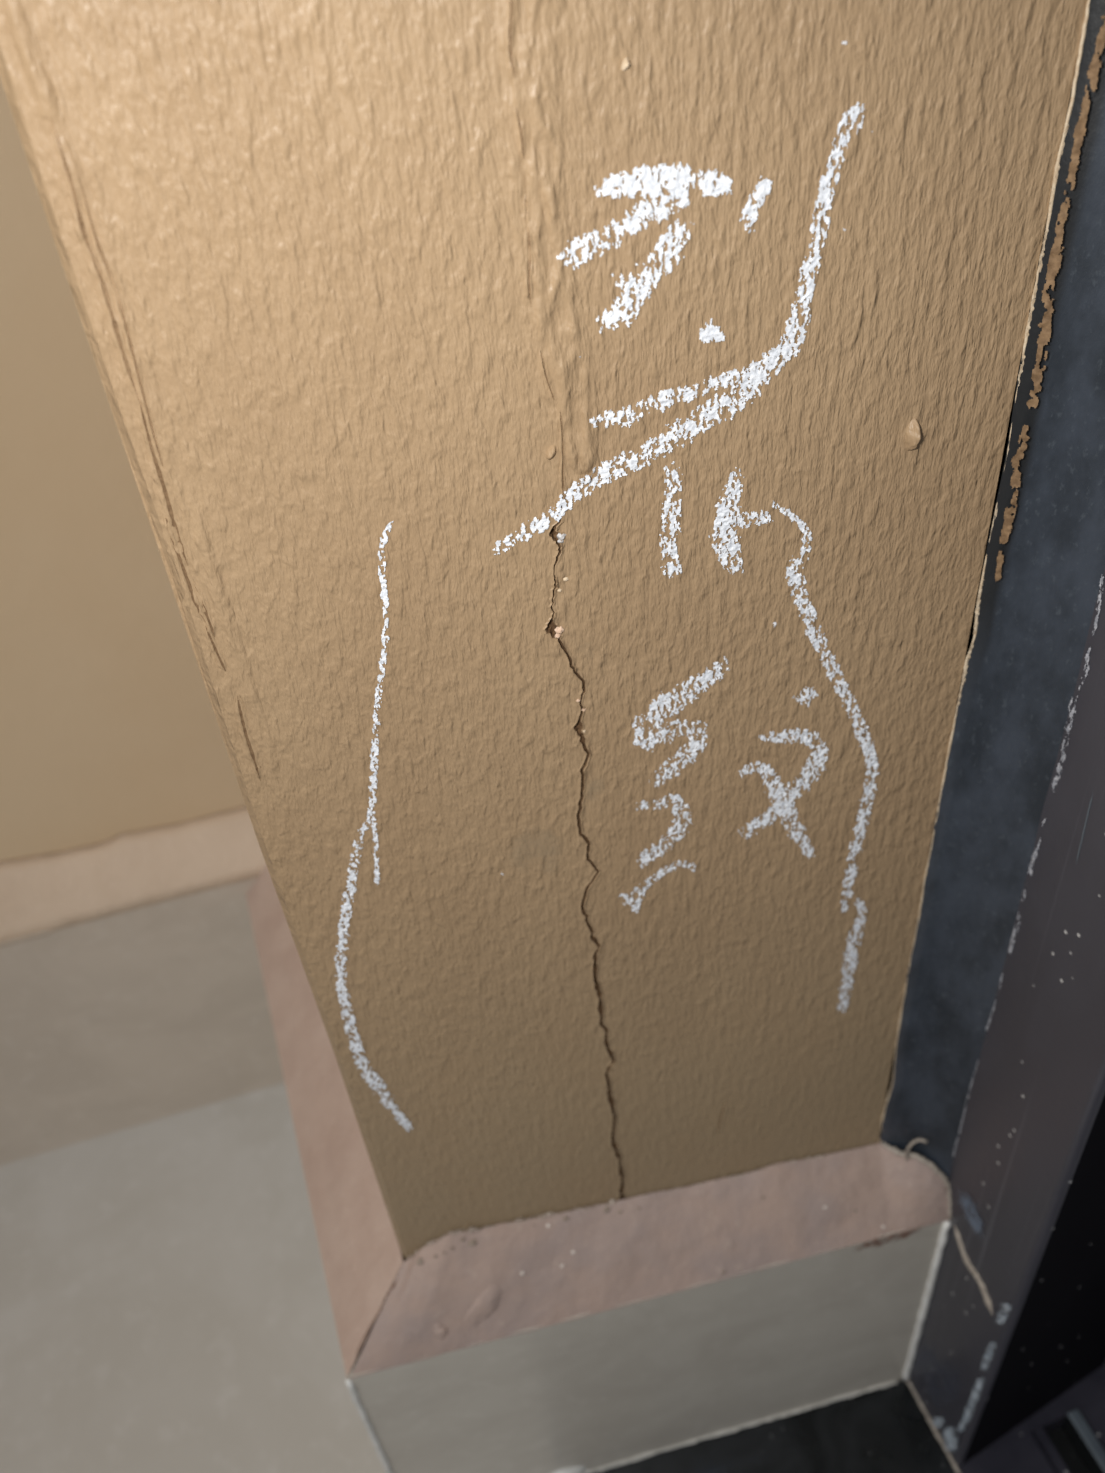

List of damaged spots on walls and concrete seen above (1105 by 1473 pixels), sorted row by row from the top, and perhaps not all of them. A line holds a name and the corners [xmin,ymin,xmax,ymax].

crack [506,0,534,305]
crack [539,351,628,1201]